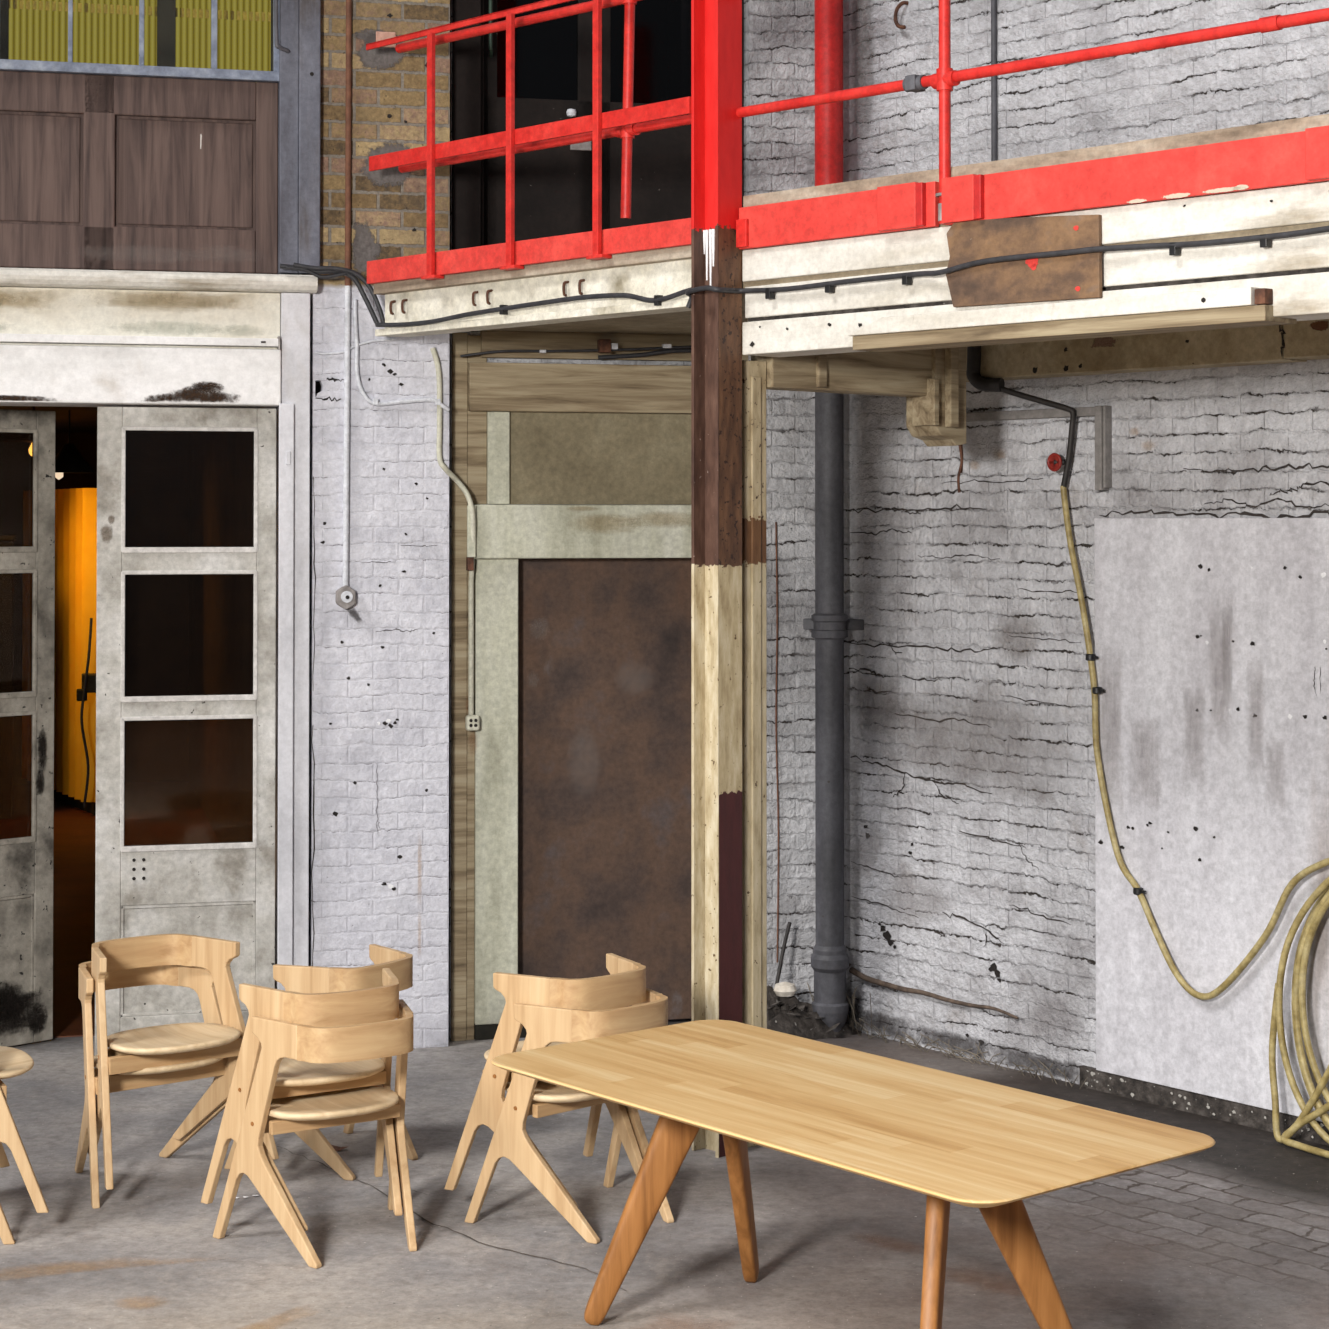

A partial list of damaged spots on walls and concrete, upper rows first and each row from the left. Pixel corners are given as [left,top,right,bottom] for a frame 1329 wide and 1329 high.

crack [849,478,1043,560]
crack [1099,463,1329,518]
crack [1020,586,1084,594]
crack [847,635,1081,727]
crack [851,755,1039,870]
crack [851,861,1004,945]
crack [1013,905,1071,925]